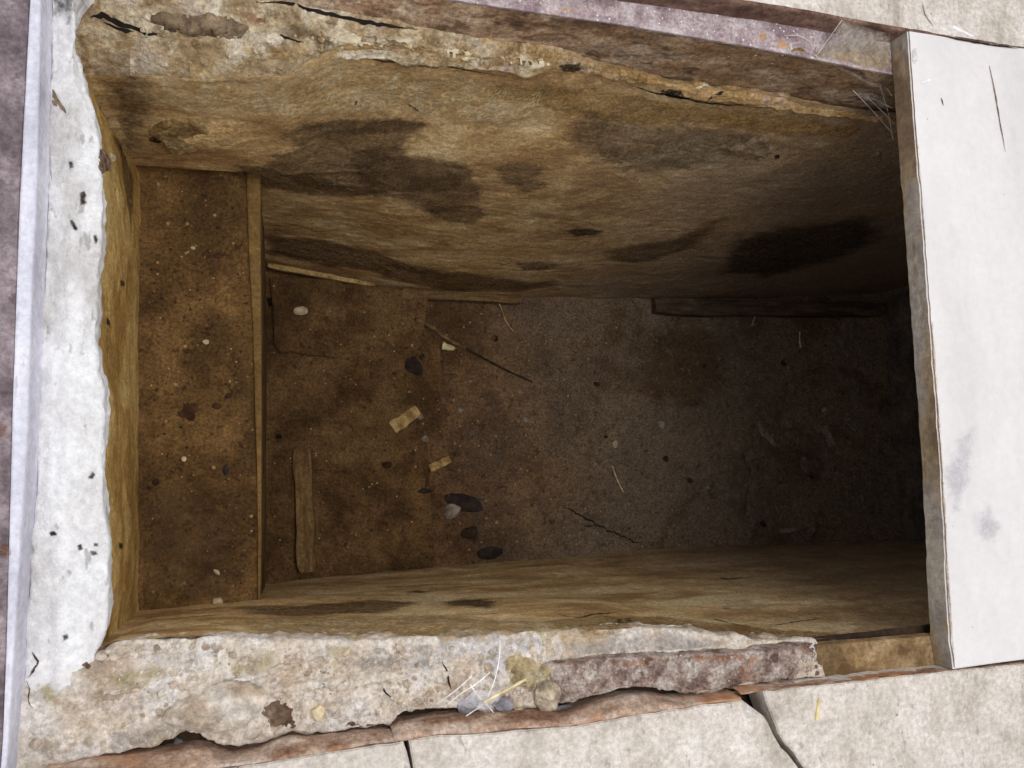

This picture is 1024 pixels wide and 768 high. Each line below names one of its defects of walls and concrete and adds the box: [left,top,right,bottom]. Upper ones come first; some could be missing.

crack [256,1,418,30]
water stain [151,57,858,223]
water stain [726,219,880,277]